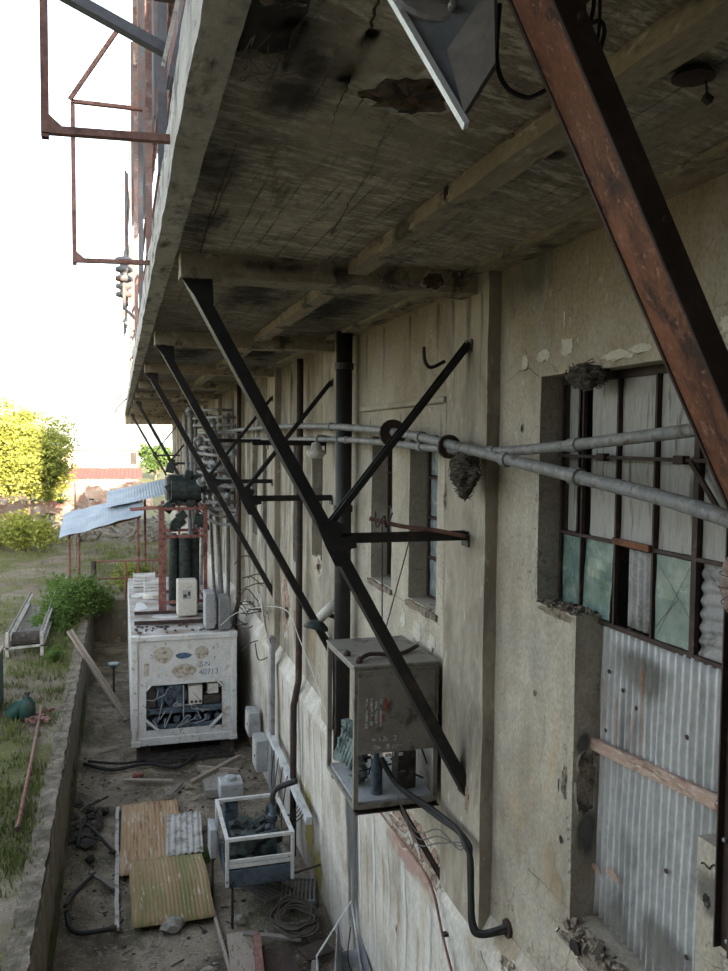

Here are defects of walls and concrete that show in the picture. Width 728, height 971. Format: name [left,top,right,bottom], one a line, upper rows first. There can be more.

water stain [267,84,317,116]
crack [326,0,380,145]
spalling [358,69,451,115]
peeling [521,338,573,370]
peeling [601,343,652,361]
water stain [577,734,589,753]
water stain [577,813,595,855]
flaking render [555,926,608,971]